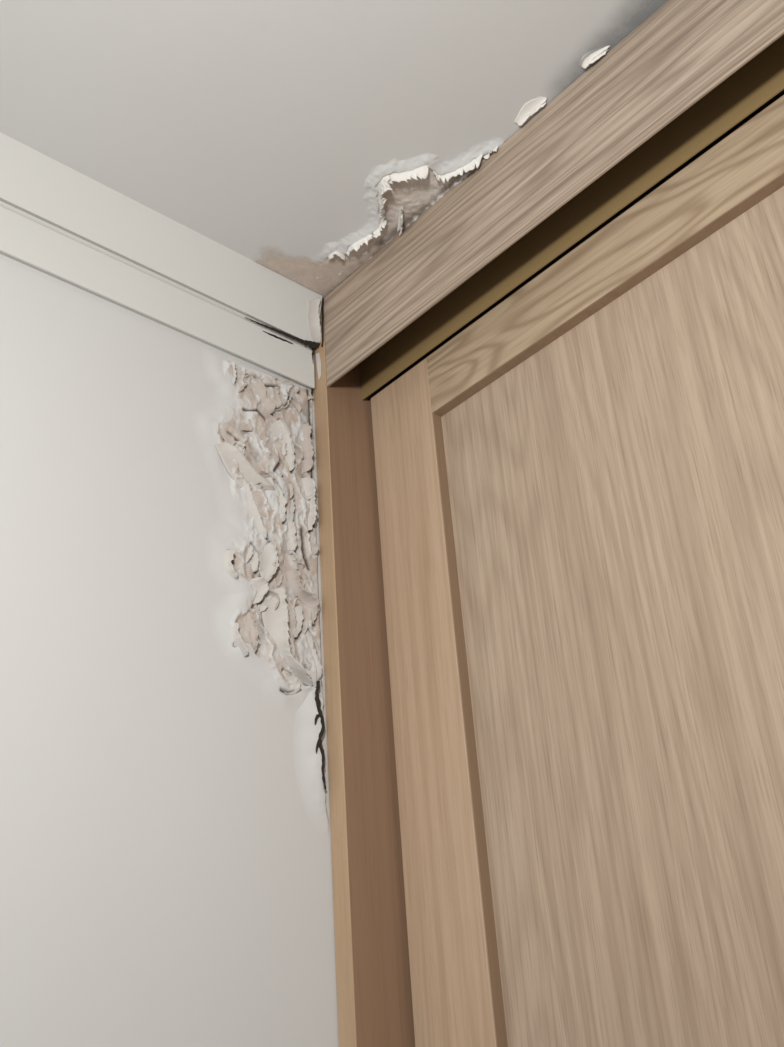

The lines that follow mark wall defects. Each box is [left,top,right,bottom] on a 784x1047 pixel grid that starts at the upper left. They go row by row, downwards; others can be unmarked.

peeling [514,97,547,126]
peeling [579,46,610,69]
peeling [306,137,505,343]
peeling [192,345,324,717]
crack [315,680,326,790]